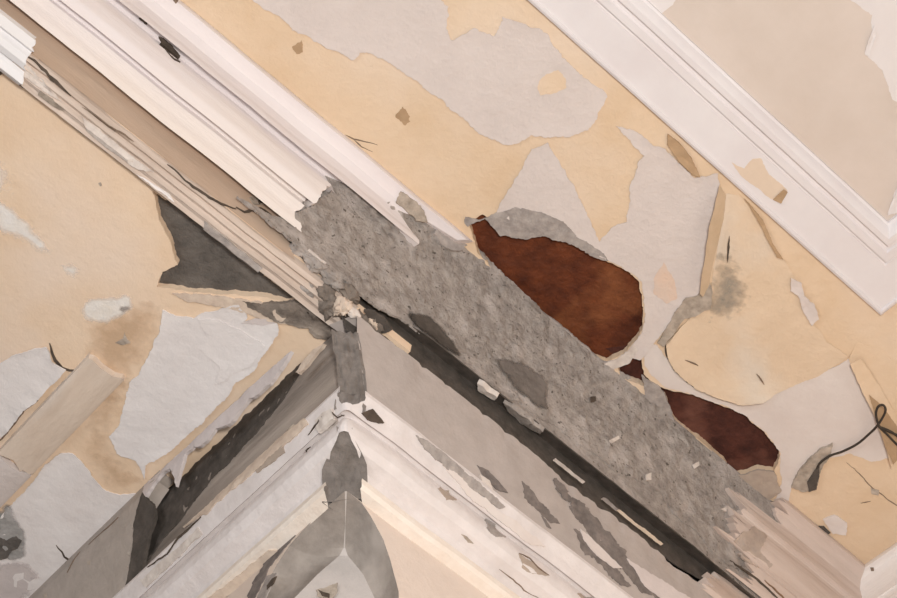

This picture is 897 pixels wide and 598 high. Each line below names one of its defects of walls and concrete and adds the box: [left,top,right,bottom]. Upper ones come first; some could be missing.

peeling [158,36,181,63]
peeling [0,115,384,598]
spalling [236,0,888,576]
peeling [851,0,897,102]